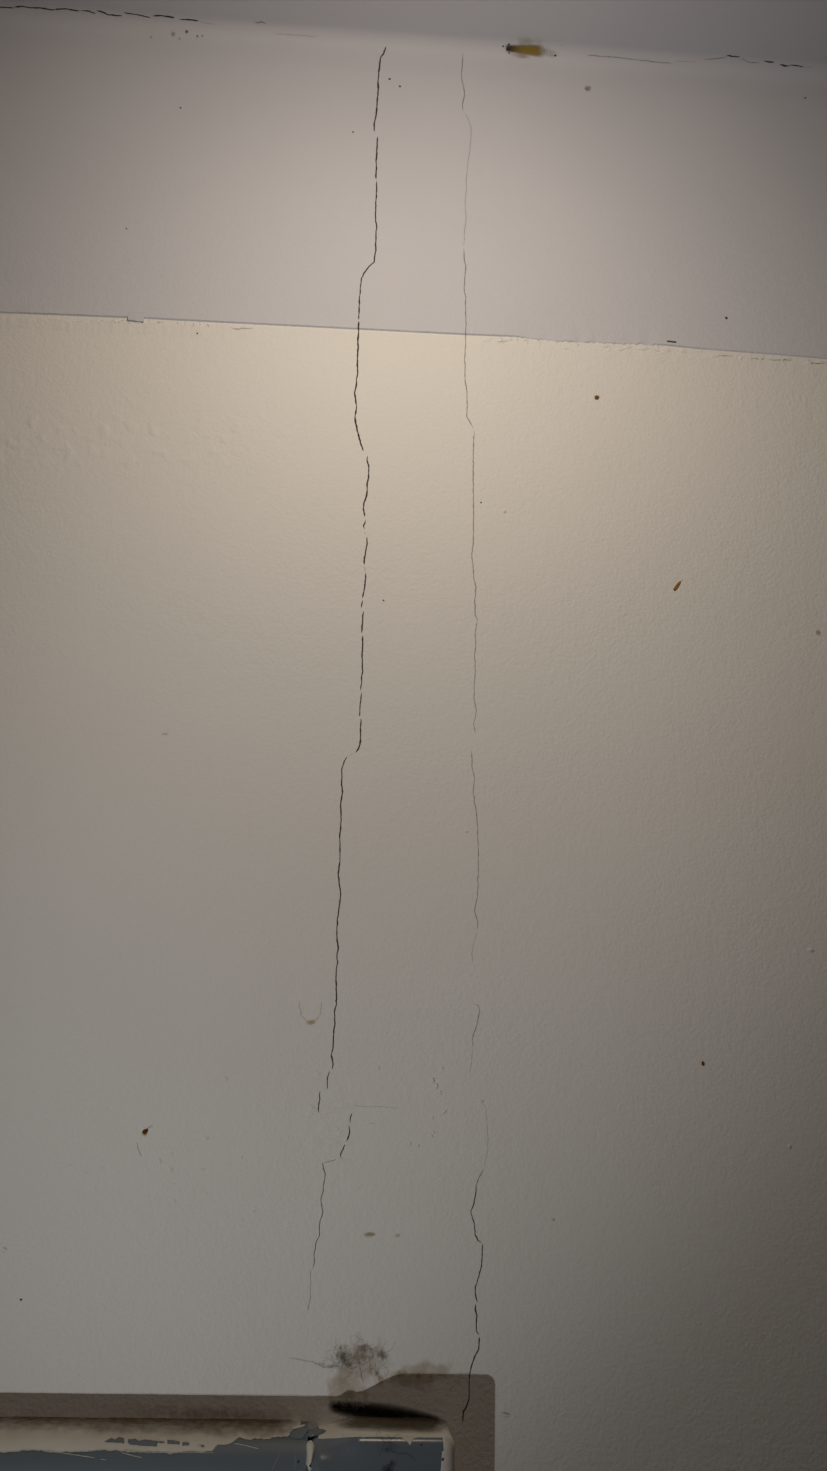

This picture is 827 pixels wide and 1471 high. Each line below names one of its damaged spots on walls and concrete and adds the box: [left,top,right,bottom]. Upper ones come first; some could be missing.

crack [0,6,198,21]
crack [310,47,386,1298]
crack [462,1171,483,1421]
peeling [105,1437,204,1447]